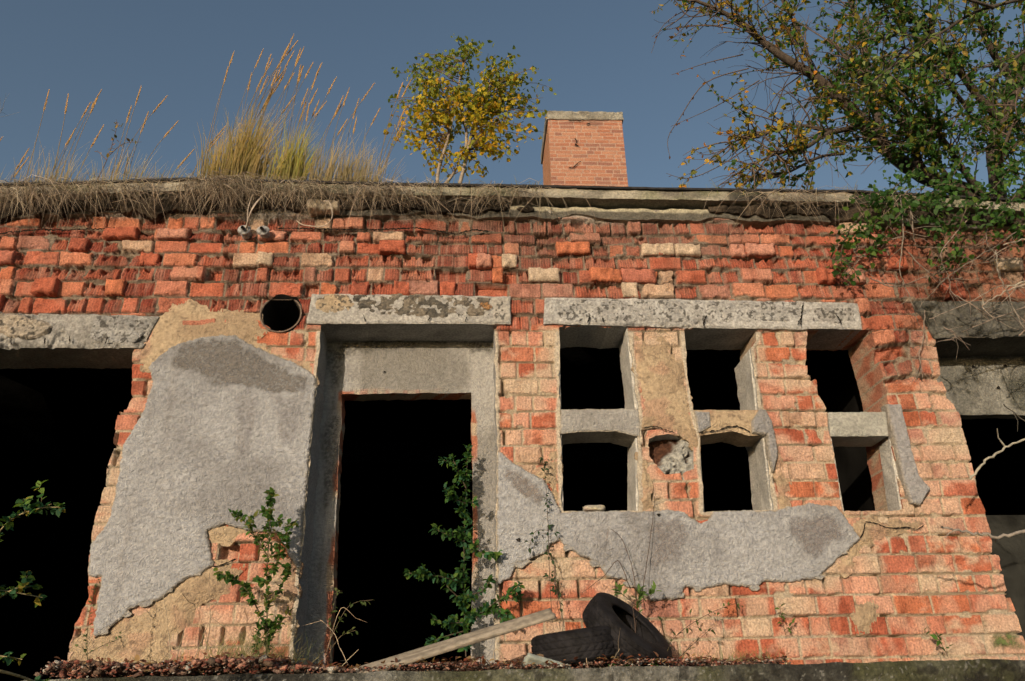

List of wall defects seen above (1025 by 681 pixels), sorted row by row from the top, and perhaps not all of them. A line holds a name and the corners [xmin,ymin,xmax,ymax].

spalling [68,226,160,266]
spalling [156,228,192,242]
spalling [255,230,287,268]
spalling [379,240,406,255]
spalling [30,277,61,297]
spalling [104,279,127,296]
spalling [315,280,510,323]
spalling [468,241,855,324]
spalling [816,267,866,286]
flaking render [69,299,320,663]
flaking render [496,404,930,602]
flaking render [848,600,880,637]